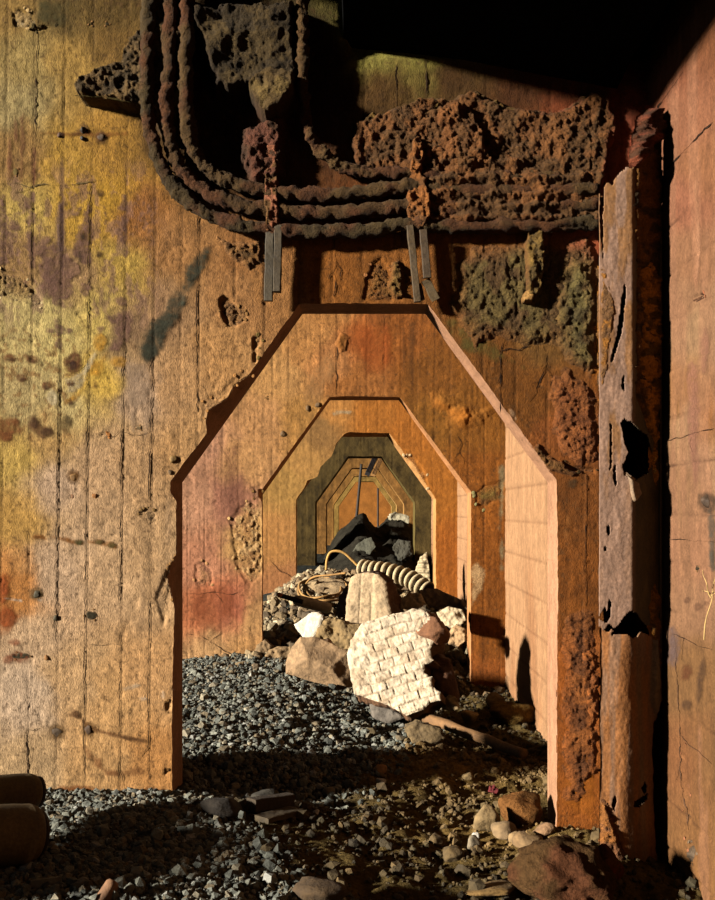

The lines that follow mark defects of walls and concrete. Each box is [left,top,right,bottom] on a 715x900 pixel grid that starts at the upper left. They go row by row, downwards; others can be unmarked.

crack [663,124,711,172]
water stain [141,249,209,361]
spalling [218,299,248,327]
spalling [364,263,401,304]
rust [351,91,668,485]
spalling [227,486,265,581]
crack [674,634,709,830]